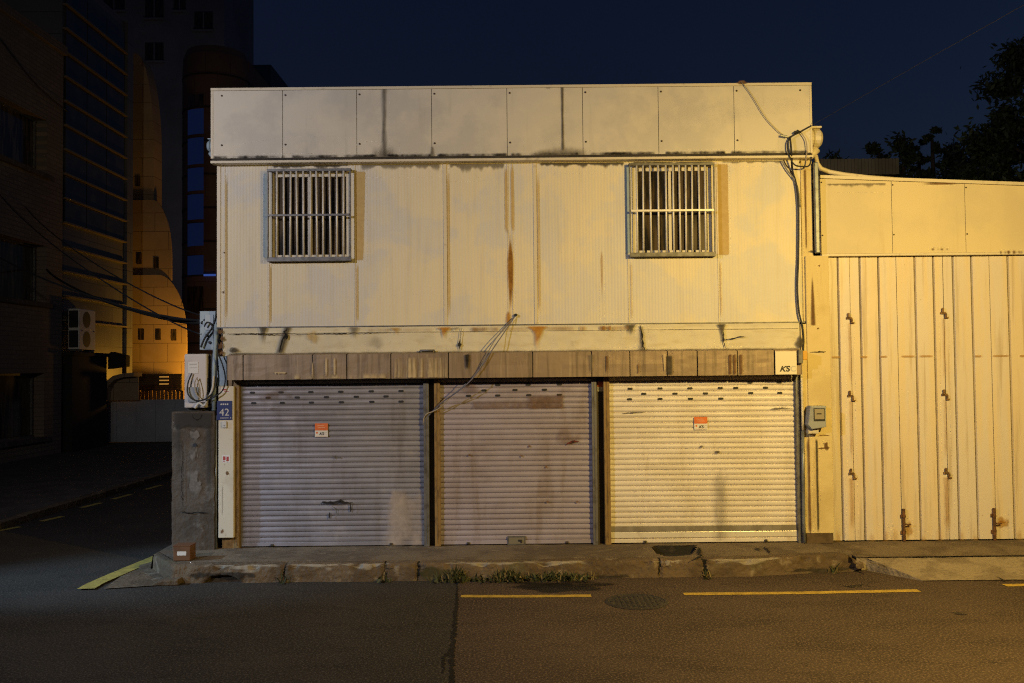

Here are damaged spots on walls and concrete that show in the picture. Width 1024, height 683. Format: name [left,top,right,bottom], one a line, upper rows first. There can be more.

damp [538,87,581,156]
damp [353,122,520,157]
rust [528,326,546,342]